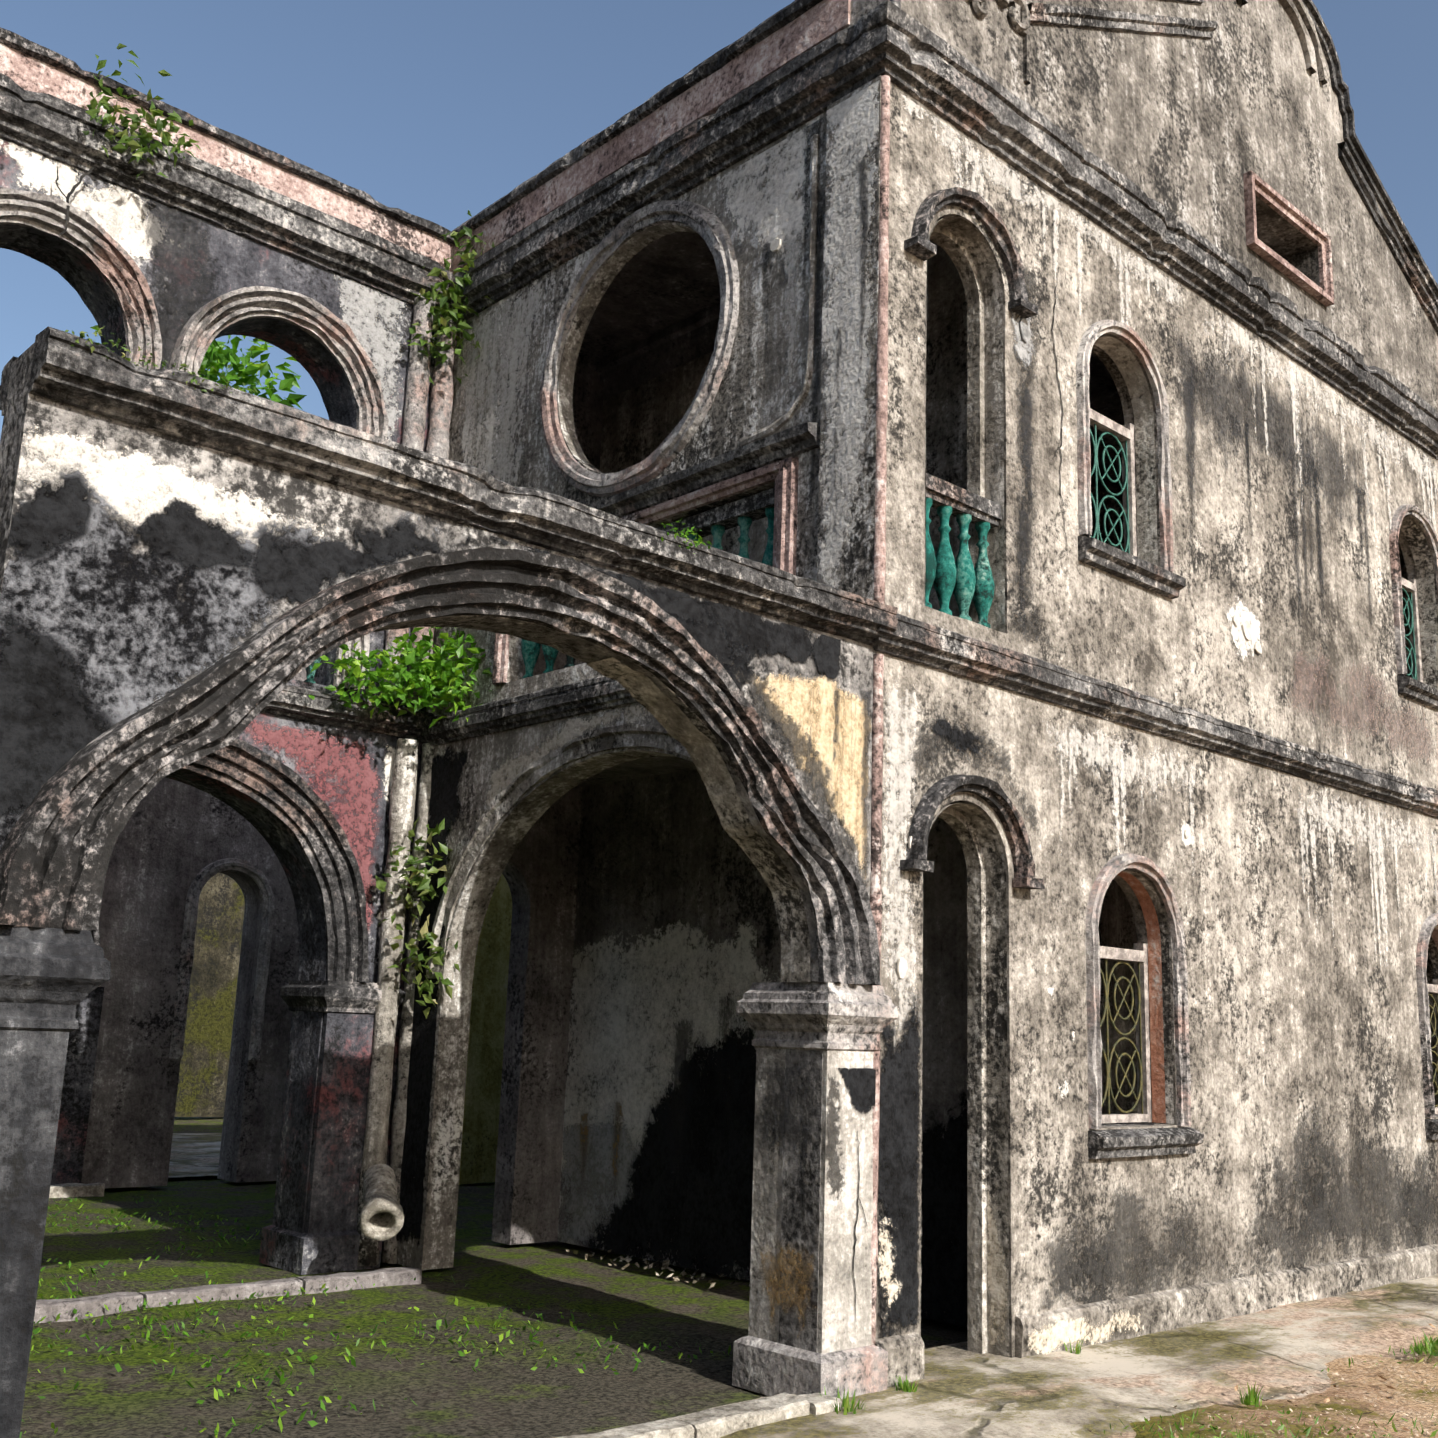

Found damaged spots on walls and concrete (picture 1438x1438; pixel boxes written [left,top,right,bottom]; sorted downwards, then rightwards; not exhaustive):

water stain [803,118,825,422]
water stain [0,463,553,852]
water stain [570,557,871,887]
water stain [911,701,1040,837]
water stain [1047,724,1196,862]
peeling [1226,595,1263,661]
rust [760,1246,813,1331]
water stain [1043,1106,1438,1310]